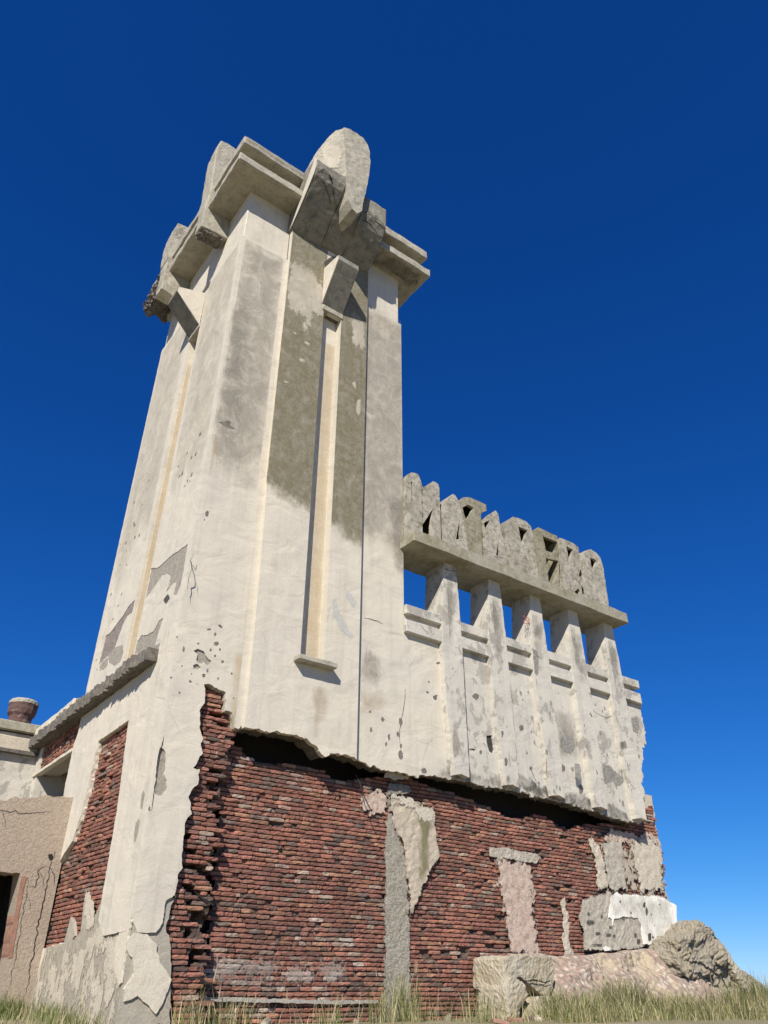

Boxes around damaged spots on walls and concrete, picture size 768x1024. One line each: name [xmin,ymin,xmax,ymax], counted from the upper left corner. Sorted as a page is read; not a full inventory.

spalling [143,272,171,324]
leakage [225,252,278,459]
leakage [363,314,403,558]
peeling [96,544,188,670]
crack [7,853,55,996]
flaking render [29,624,669,1024]